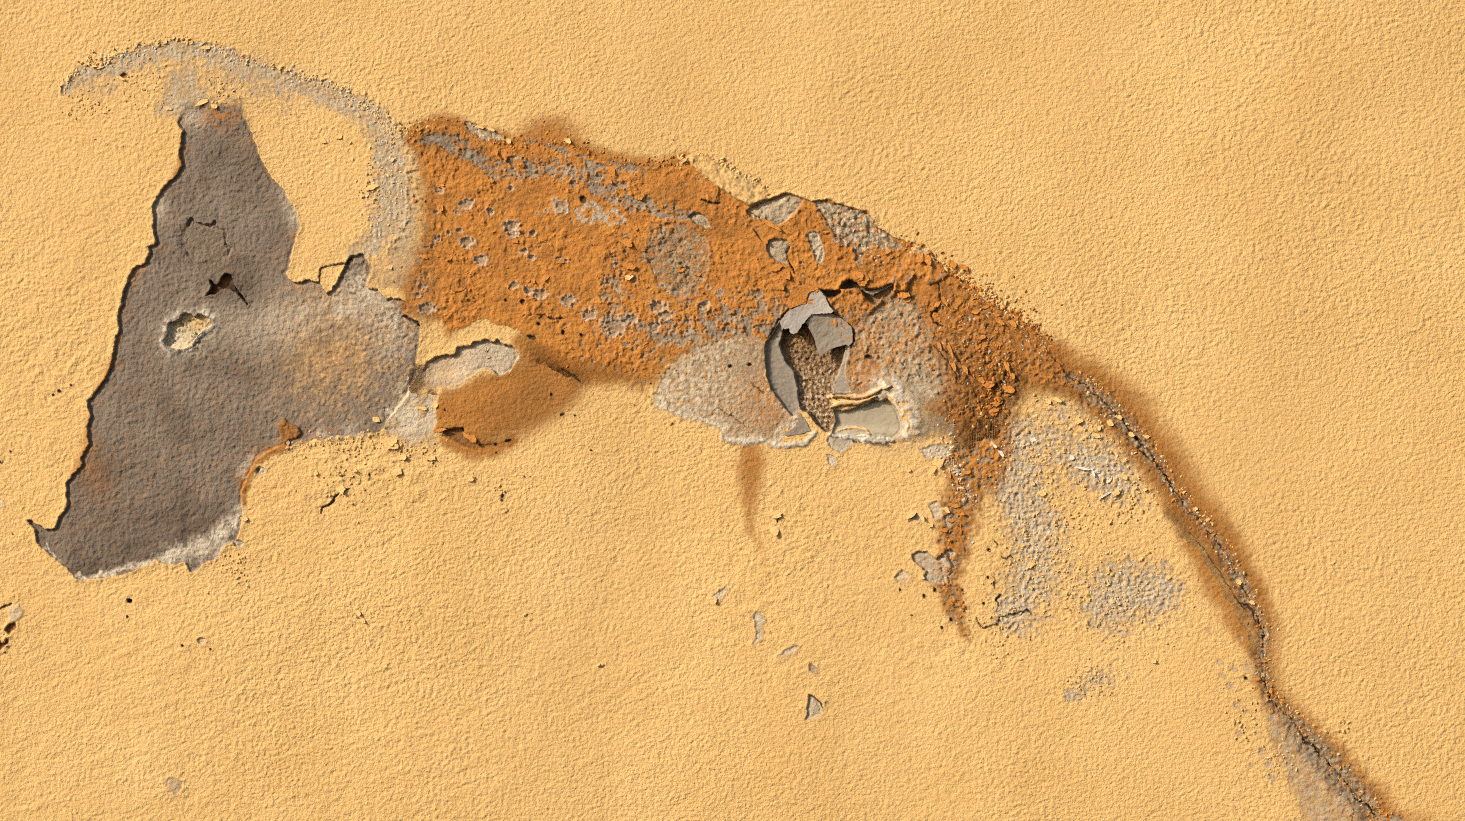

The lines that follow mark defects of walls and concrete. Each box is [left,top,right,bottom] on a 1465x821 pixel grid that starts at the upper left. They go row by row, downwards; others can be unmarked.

peeling [29,99,519,580]
corrosion [373,417,403,460]
peeling [645,193,949,466]
corrosion [386,107,1271,649]
peeling [752,612,765,645]
peeling [805,694,829,720]
crack [1053,358,1386,821]
corrosion [1259,669,1405,821]